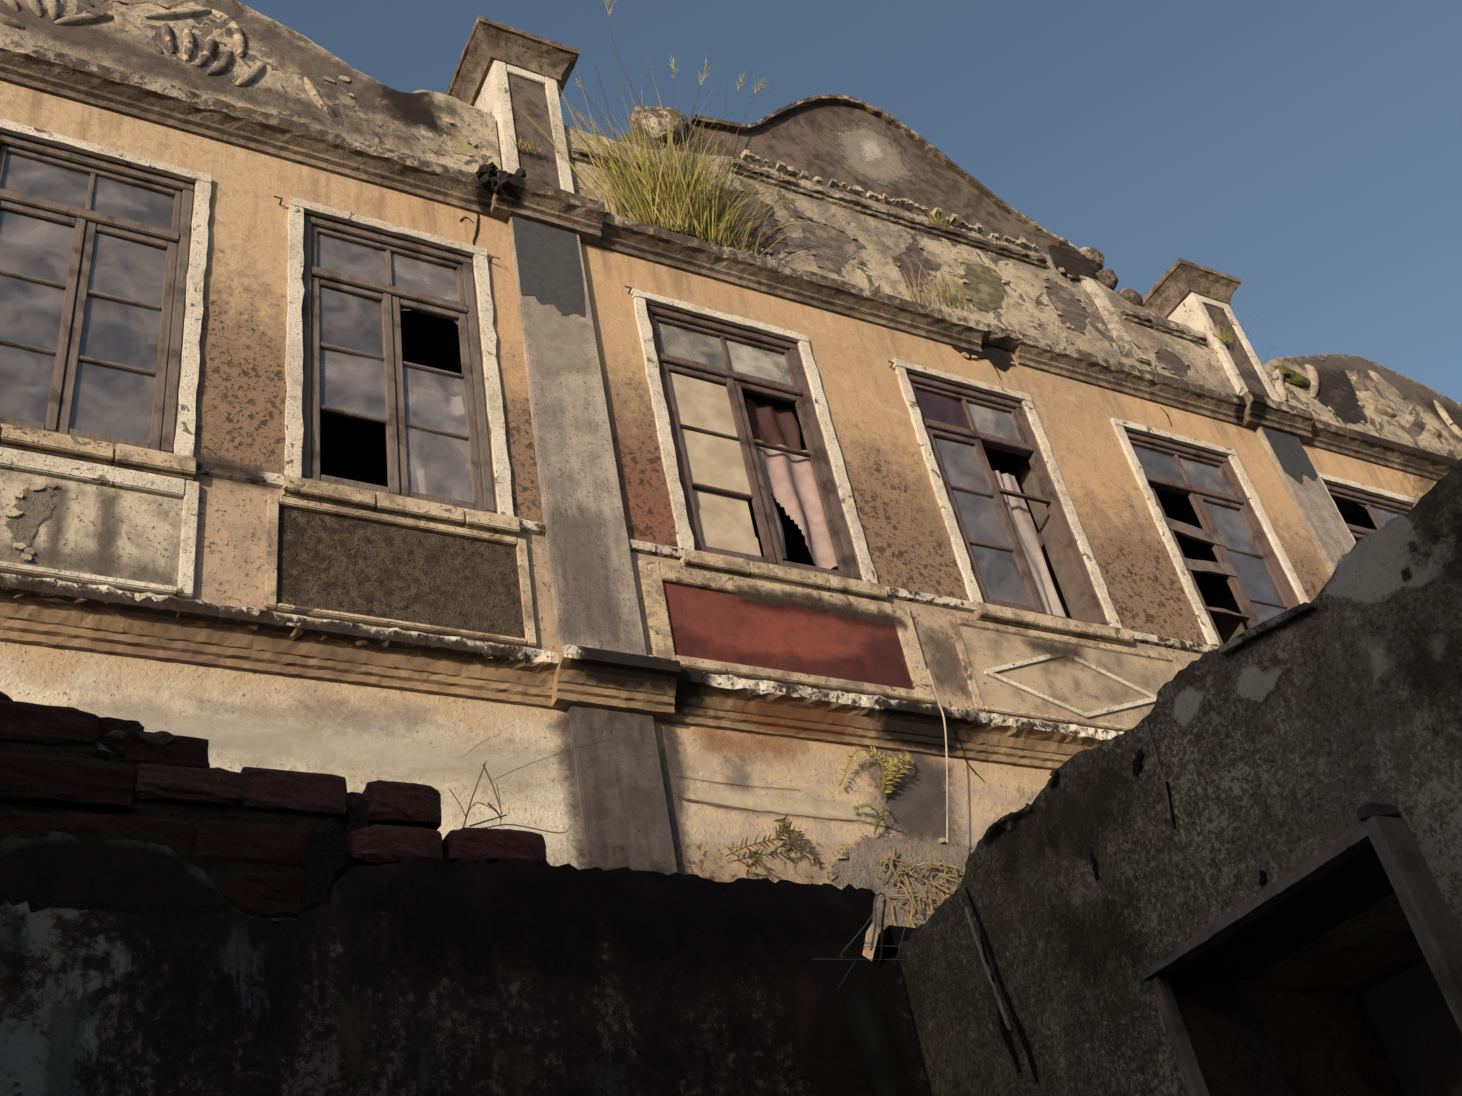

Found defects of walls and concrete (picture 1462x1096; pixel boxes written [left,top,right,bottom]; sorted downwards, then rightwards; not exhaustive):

peeling [512,216,586,317]
spalling [715,186,867,275]
spalling [892,232,942,291]
spalling [962,262,1009,312]
spalling [1043,243,1097,336]
spalling [4,482,57,564]
peeling [1324,512,1459,605]
damp [552,512,979,875]
peeling [91,730,178,759]
crack [1132,749,1176,829]
damp [0,835,270,1021]
crack [965,887,1038,1082]